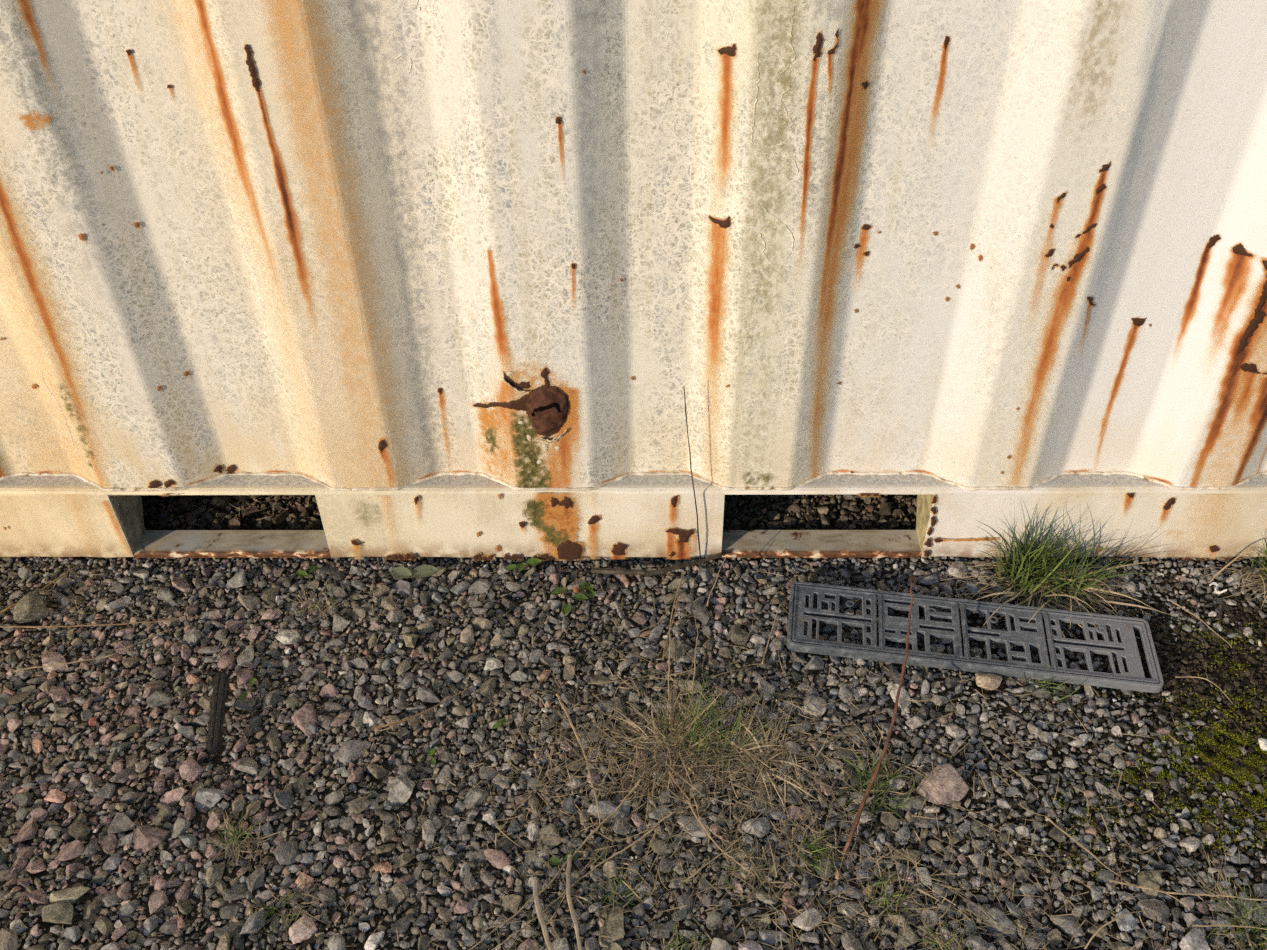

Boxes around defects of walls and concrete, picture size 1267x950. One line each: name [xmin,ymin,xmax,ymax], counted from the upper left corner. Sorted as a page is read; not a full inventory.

corrosion [0,183,90,435]
corrosion [194,0,269,255]
corrosion [244,44,311,311]
corrosion [487,250,510,365]
corrosion [708,216,730,376]
corrosion [718,44,736,174]
corrosion [800,0,884,478]
corrosion [1001,162,1111,474]
corrosion [1098,317,1151,452]
corrosion [1178,235,1267,518]
corrosion [473,493,600,561]
corrosion [666,496,696,560]